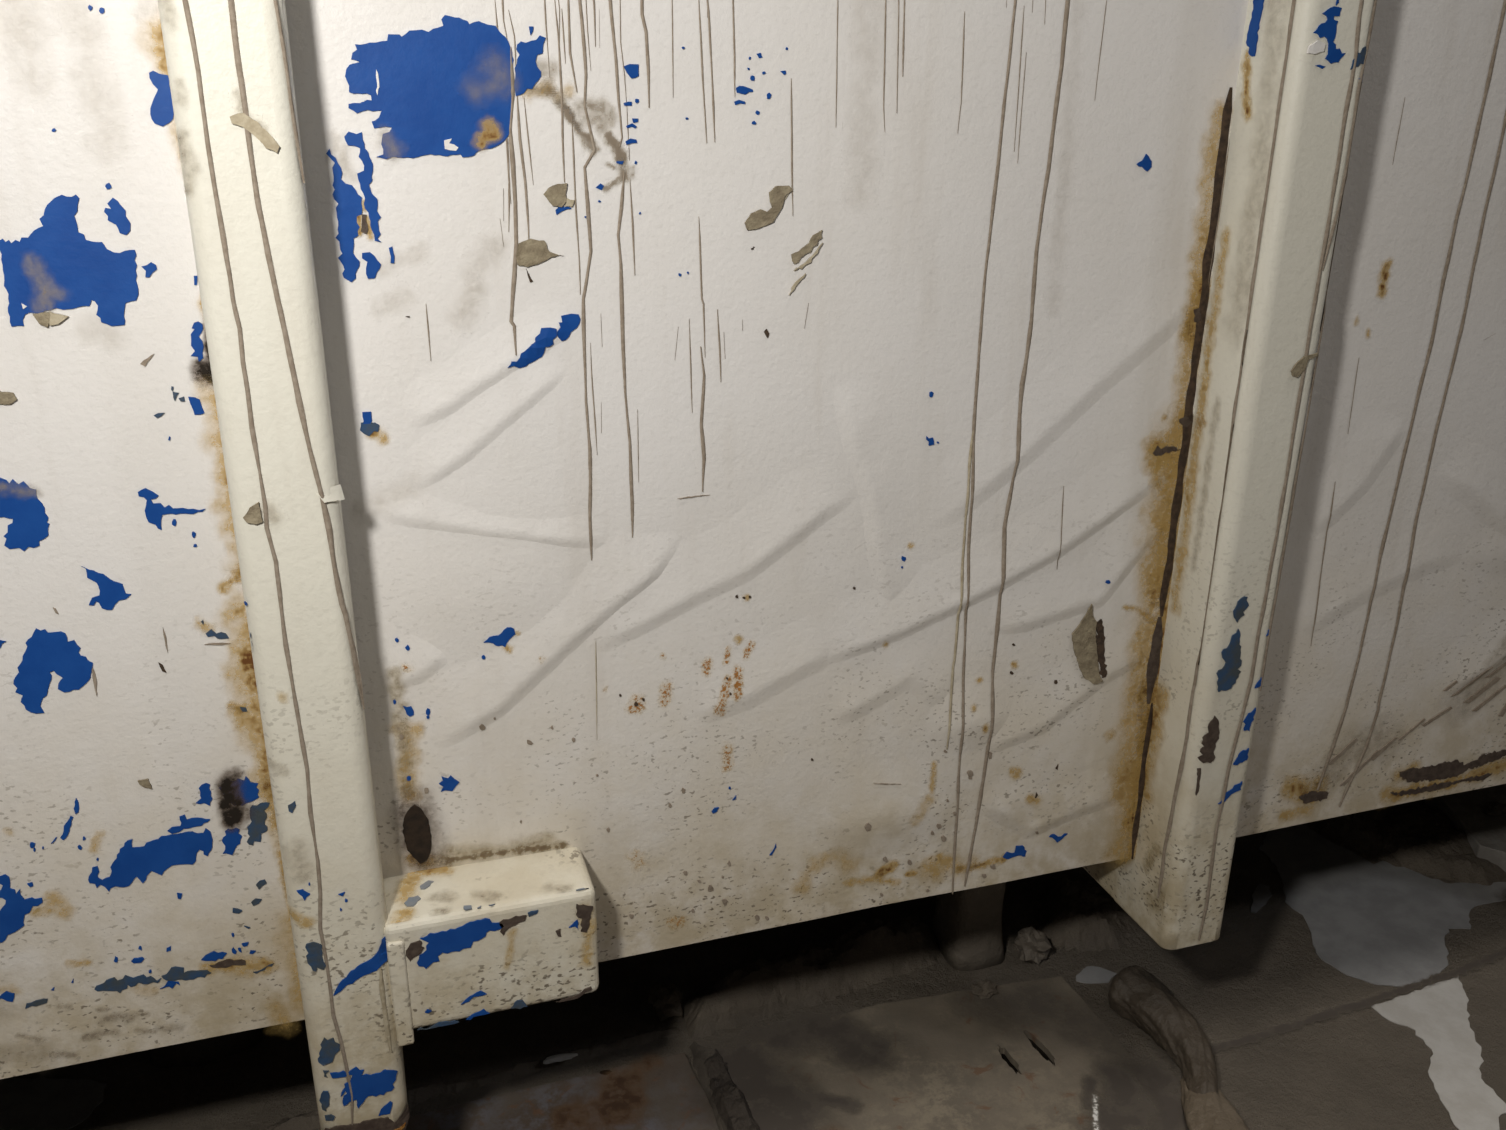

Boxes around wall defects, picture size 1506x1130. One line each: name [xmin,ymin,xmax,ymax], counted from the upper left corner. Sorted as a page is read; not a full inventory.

rust [152,23,168,75]
rust [1243,52,1251,118]
peeling [326,15,545,282]
peeling [0,183,157,327]
peeling [508,314,580,368]
peeling [0,478,49,551]
rust [1123,233,1228,857]
peeling [13,607,93,714]
rust [219,563,277,828]
rust [702,636,754,715]
rust [1382,750,1506,802]
peeling [88,770,270,891]